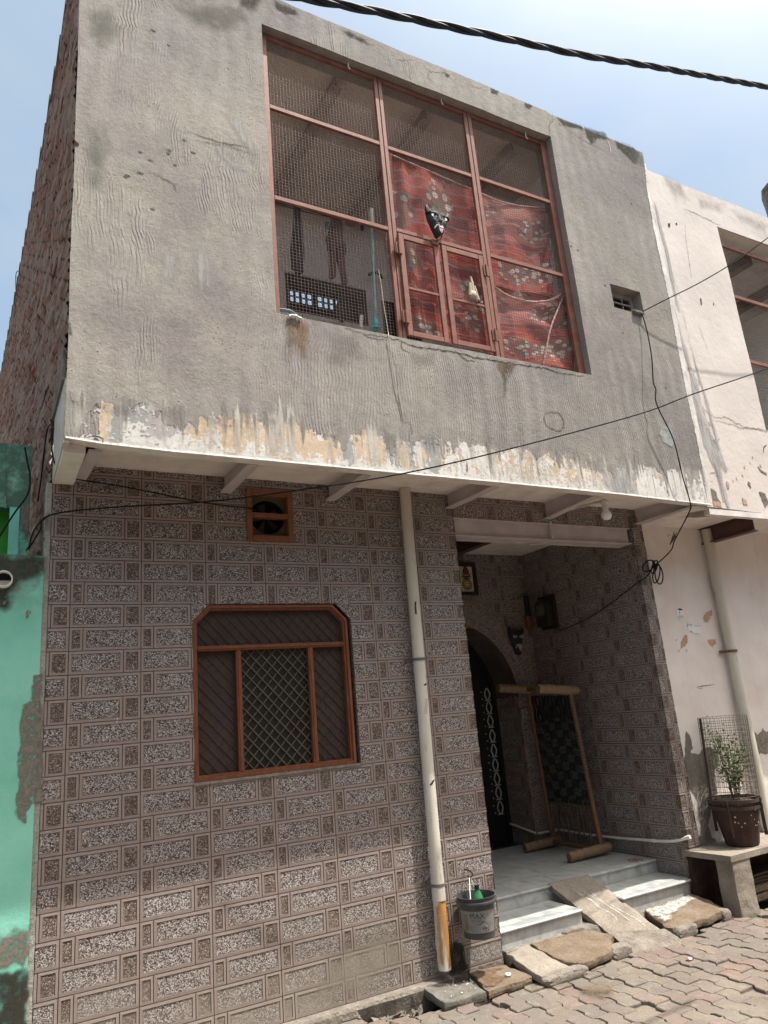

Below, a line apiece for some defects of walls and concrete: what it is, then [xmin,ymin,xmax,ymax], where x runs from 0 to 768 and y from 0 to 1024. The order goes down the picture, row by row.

peeling [65,390,768,518]
peeling [16,675,44,823]
rust [436,900,451,967]